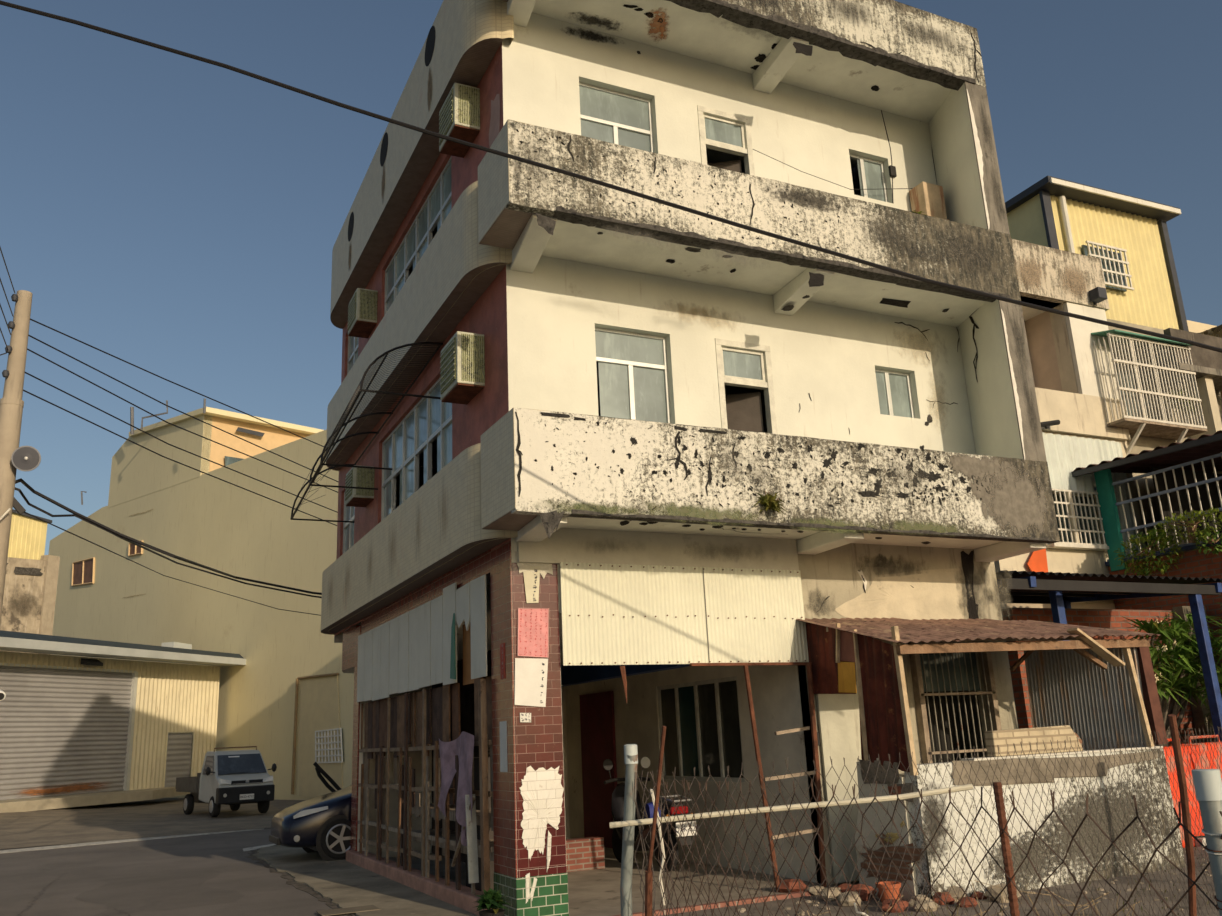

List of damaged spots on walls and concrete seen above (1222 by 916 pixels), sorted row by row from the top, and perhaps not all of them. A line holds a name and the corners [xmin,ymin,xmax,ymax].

water stain [566,13,620,44]
spalling [622,4,663,23]
corrosion [648,8,669,39]
water stain [830,0,865,21]
water stain [908,25,952,48]
spalling [666,0,990,229]
crack [748,184,756,225]
water stain [769,187,840,212]
crack [894,313,979,382]
crack [515,412,523,497]
crack [667,431,737,496]
spalling [540,426,1049,619]